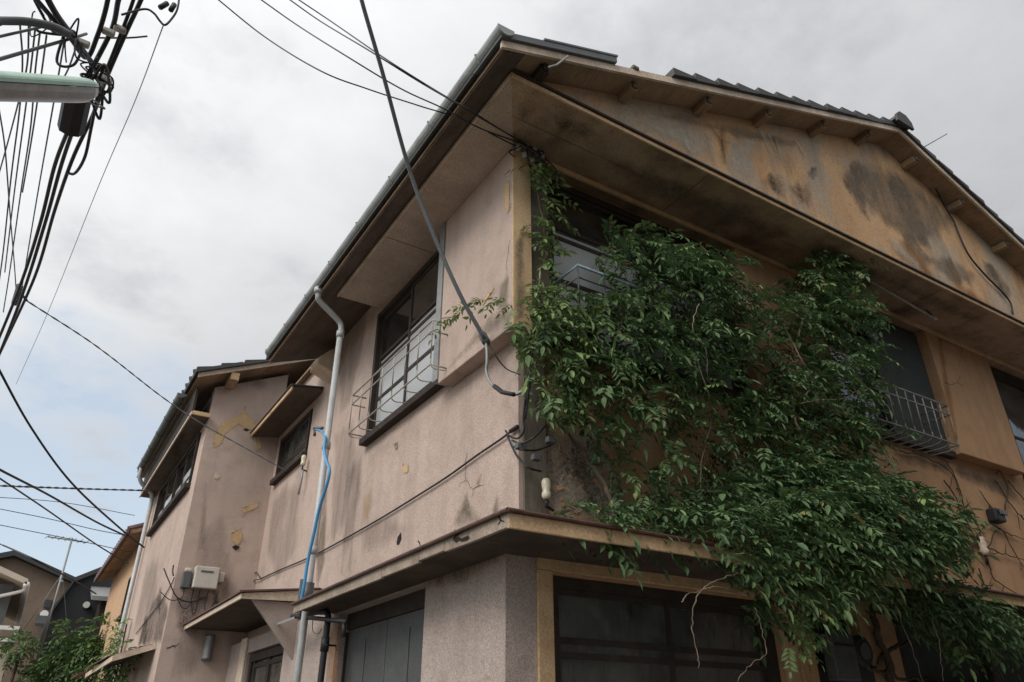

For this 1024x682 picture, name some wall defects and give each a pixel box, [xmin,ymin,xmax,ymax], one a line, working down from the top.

damp [847,166,969,284]